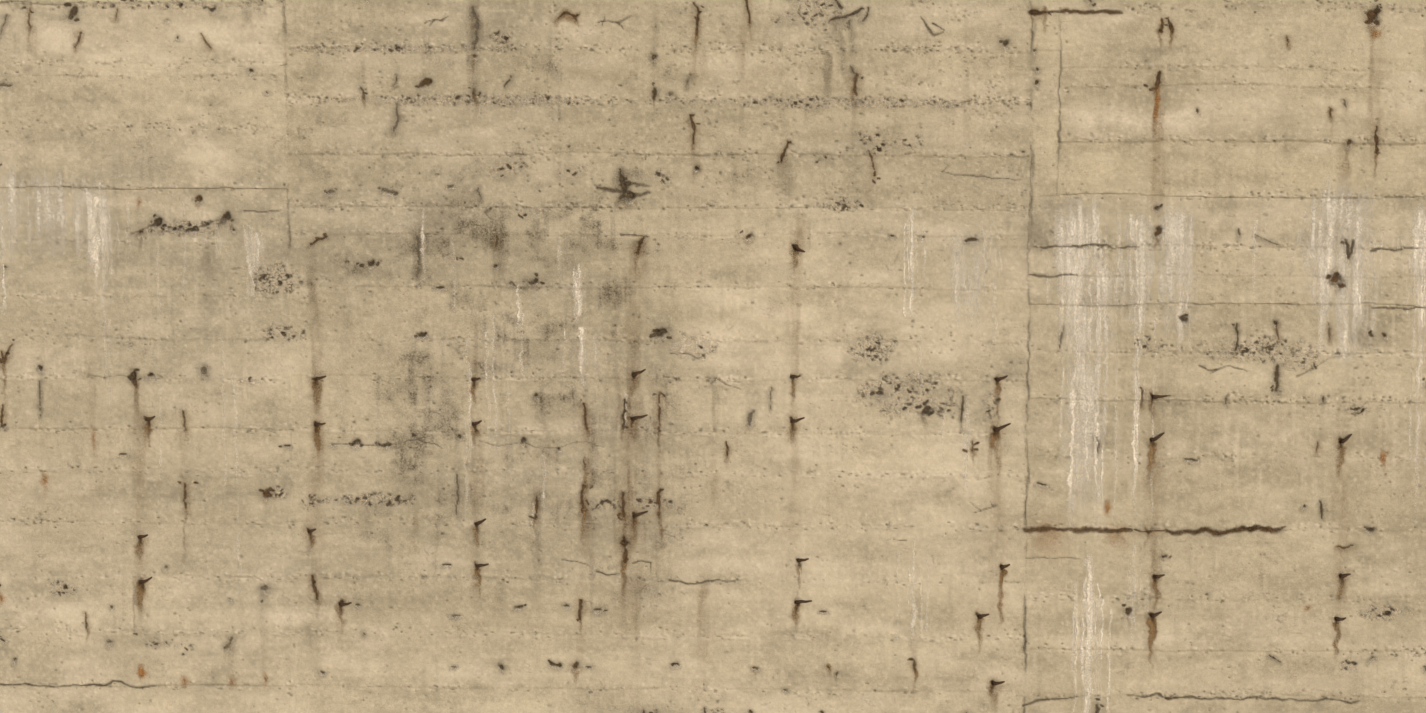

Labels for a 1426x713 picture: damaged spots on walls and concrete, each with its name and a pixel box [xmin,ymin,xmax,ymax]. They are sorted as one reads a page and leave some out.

corrosion [1144,71,1161,118]
efflorescence [1047,202,1193,523]
efflorescence [1307,188,1373,352]
efflorescence [1382,210,1426,468]
corrosion [617,492,635,576]
corrosion [1148,442,1156,470]
efflorescence [1071,555,1148,713]
corrosion [1147,613,1157,653]